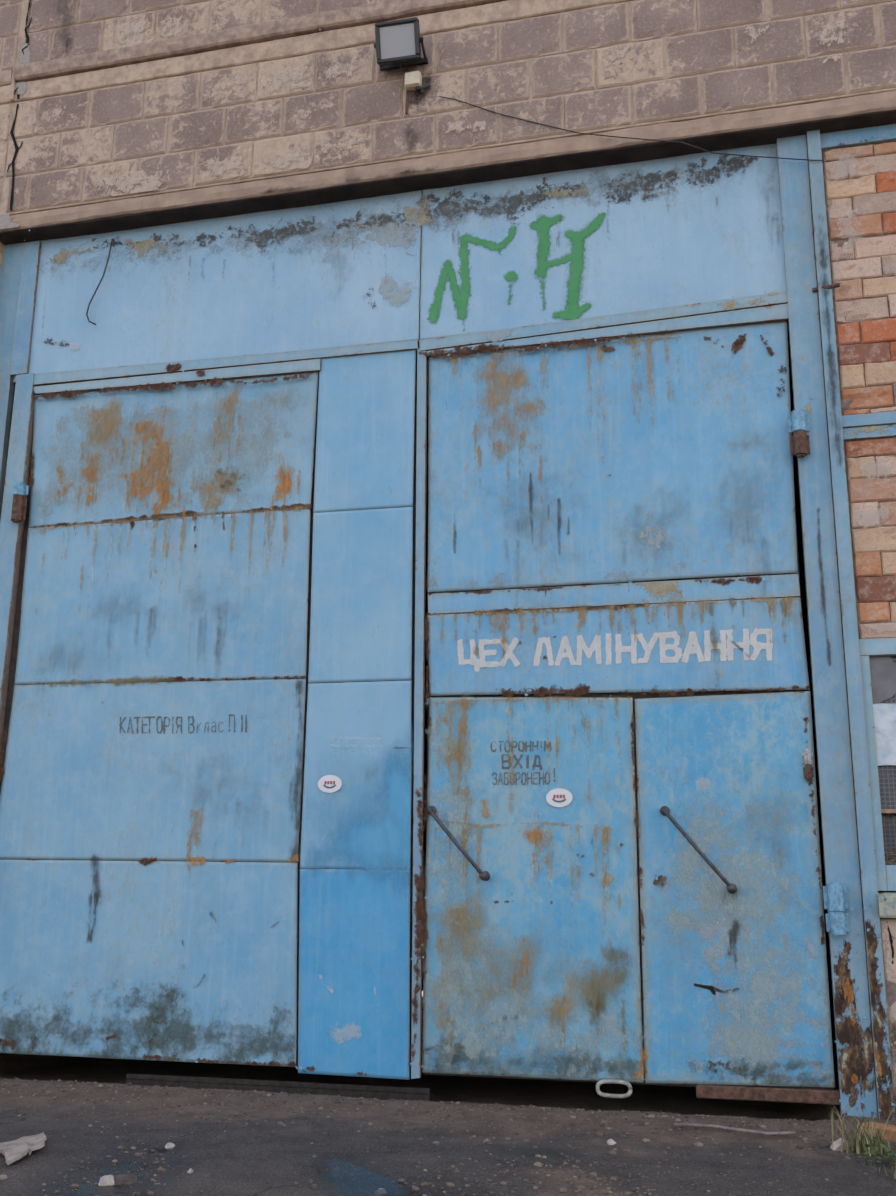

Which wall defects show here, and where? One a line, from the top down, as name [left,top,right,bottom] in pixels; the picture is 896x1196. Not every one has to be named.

crack [22,0,32,54]
crack [7,87,23,211]
peeling [205,130,368,182]
peeling [46,155,758,266]
corrosion [418,330,675,414]
corrosion [33,362,317,566]
corrosion [410,575,810,1068]
corrosion [819,915,895,1120]